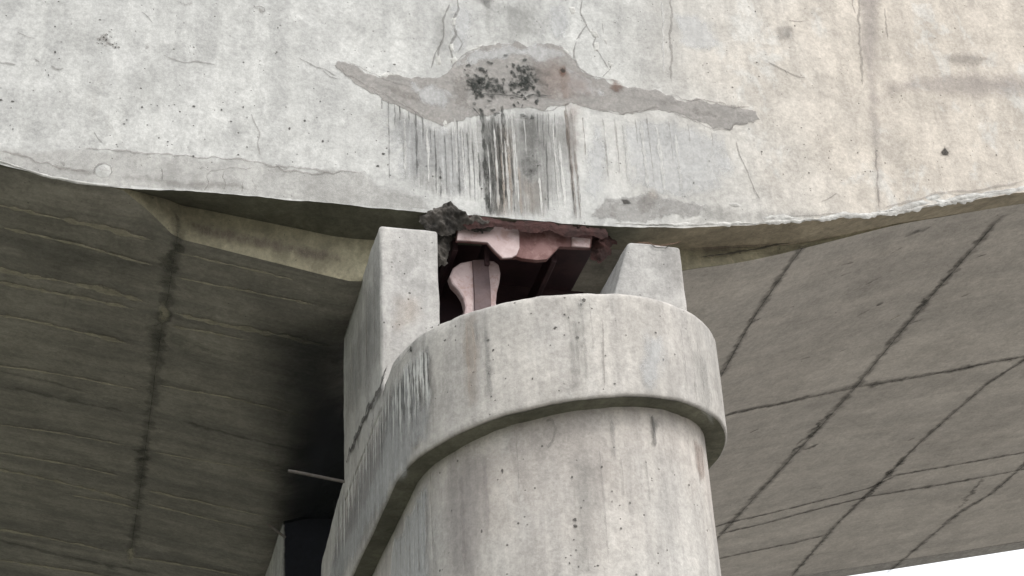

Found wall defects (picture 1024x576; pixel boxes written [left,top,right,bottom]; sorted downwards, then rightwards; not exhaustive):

spalling [335,41,759,130]
water stain [399,54,565,209]
spalling [419,186,1024,267]
crack [702,243,786,257]